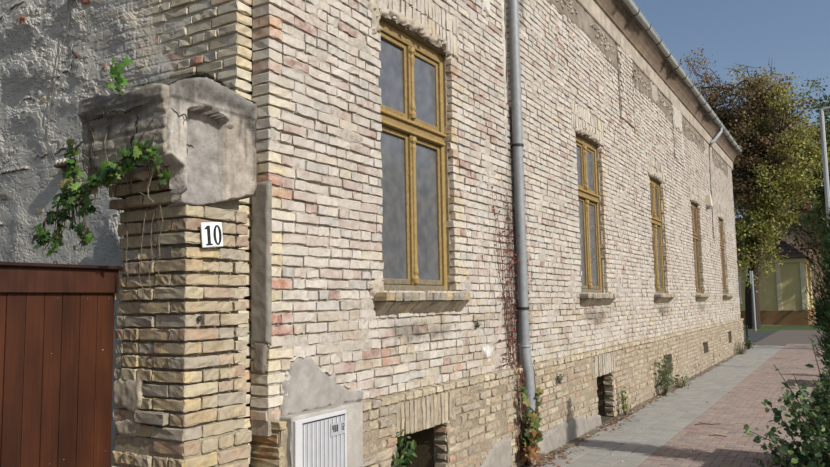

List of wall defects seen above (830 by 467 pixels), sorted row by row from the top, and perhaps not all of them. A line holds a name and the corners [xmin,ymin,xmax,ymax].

crack [0,105,163,175]